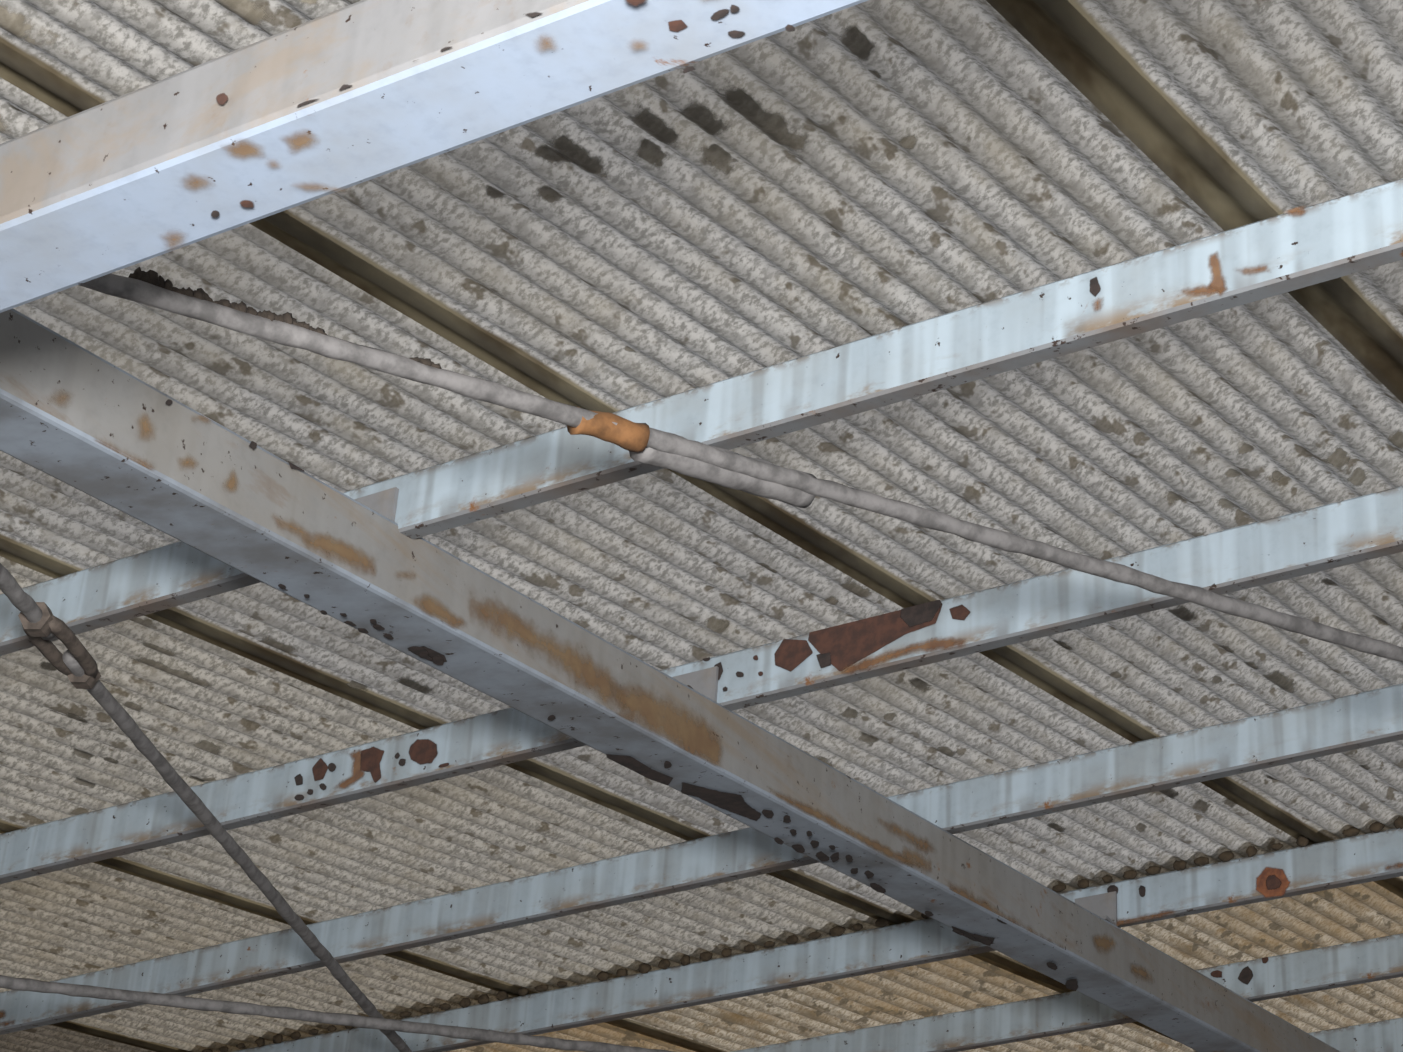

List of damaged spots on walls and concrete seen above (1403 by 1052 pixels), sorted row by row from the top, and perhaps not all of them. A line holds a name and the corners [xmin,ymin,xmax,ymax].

corrosion [229,142,257,157]
corrosion [288,134,312,149]
corrosion [189,178,206,187]
corrosion [1183,254,1226,295]
corrosion [1090,277,1101,310]
corrosion [774,600,970,673]
corrosion [294,739,449,801]
corrosion [1256,867,1290,897]